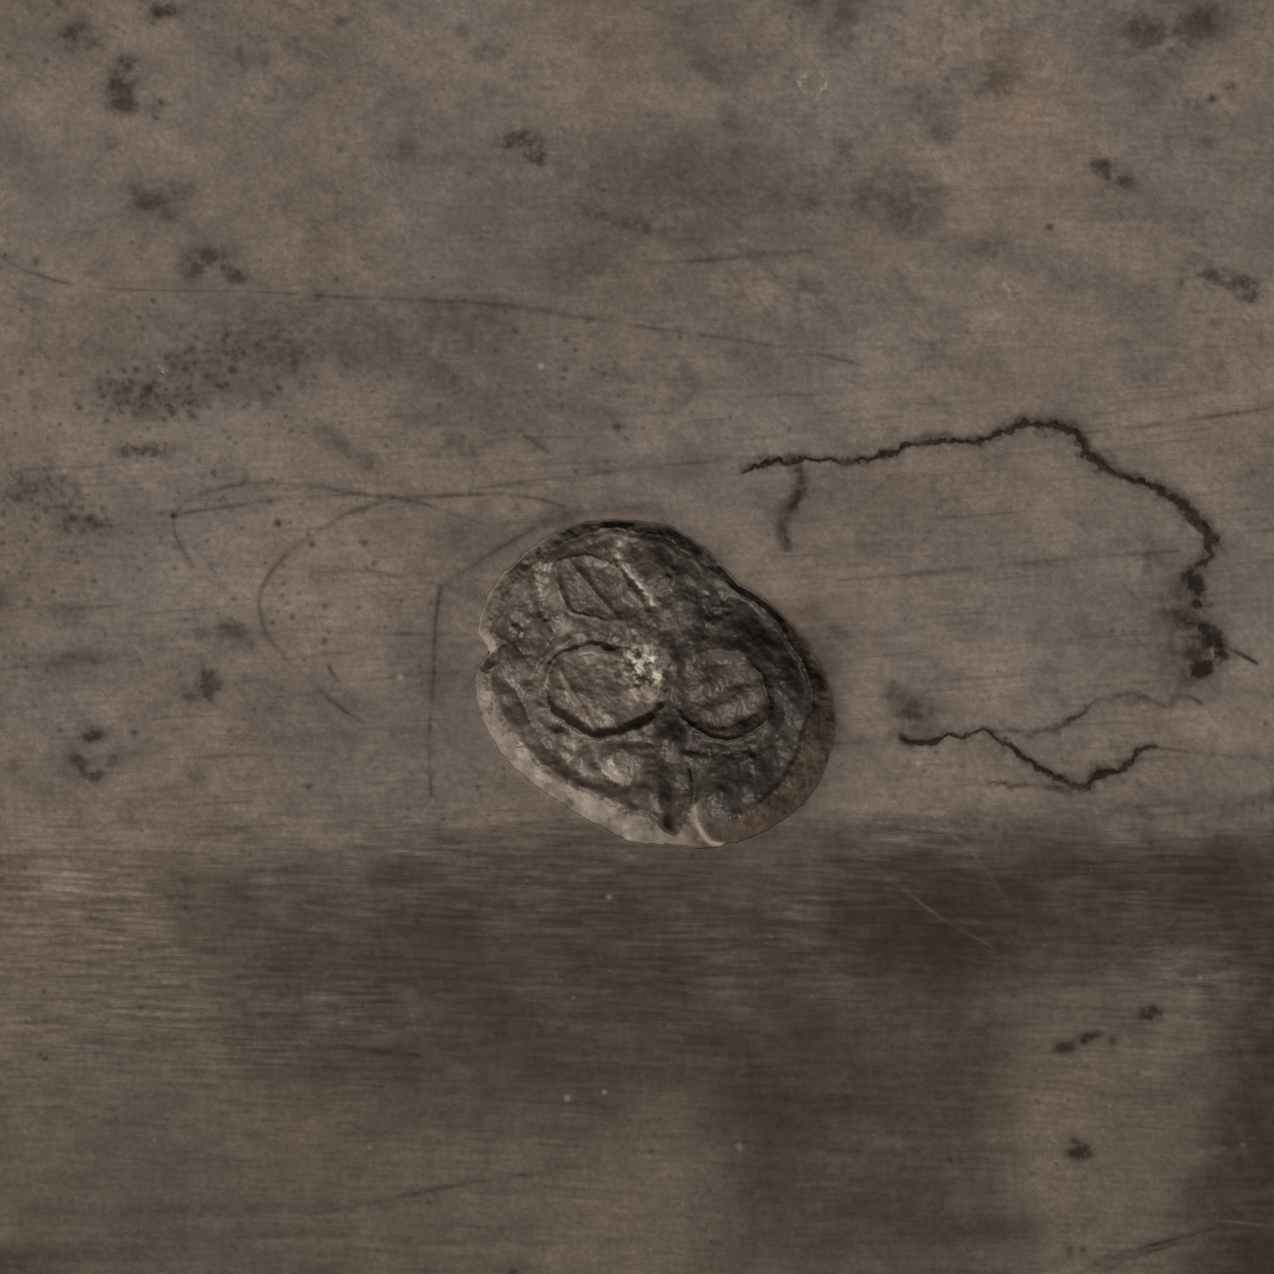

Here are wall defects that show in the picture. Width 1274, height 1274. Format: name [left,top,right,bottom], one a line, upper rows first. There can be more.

crack [741,417,1257,678]
crack [900,728,1156,791]